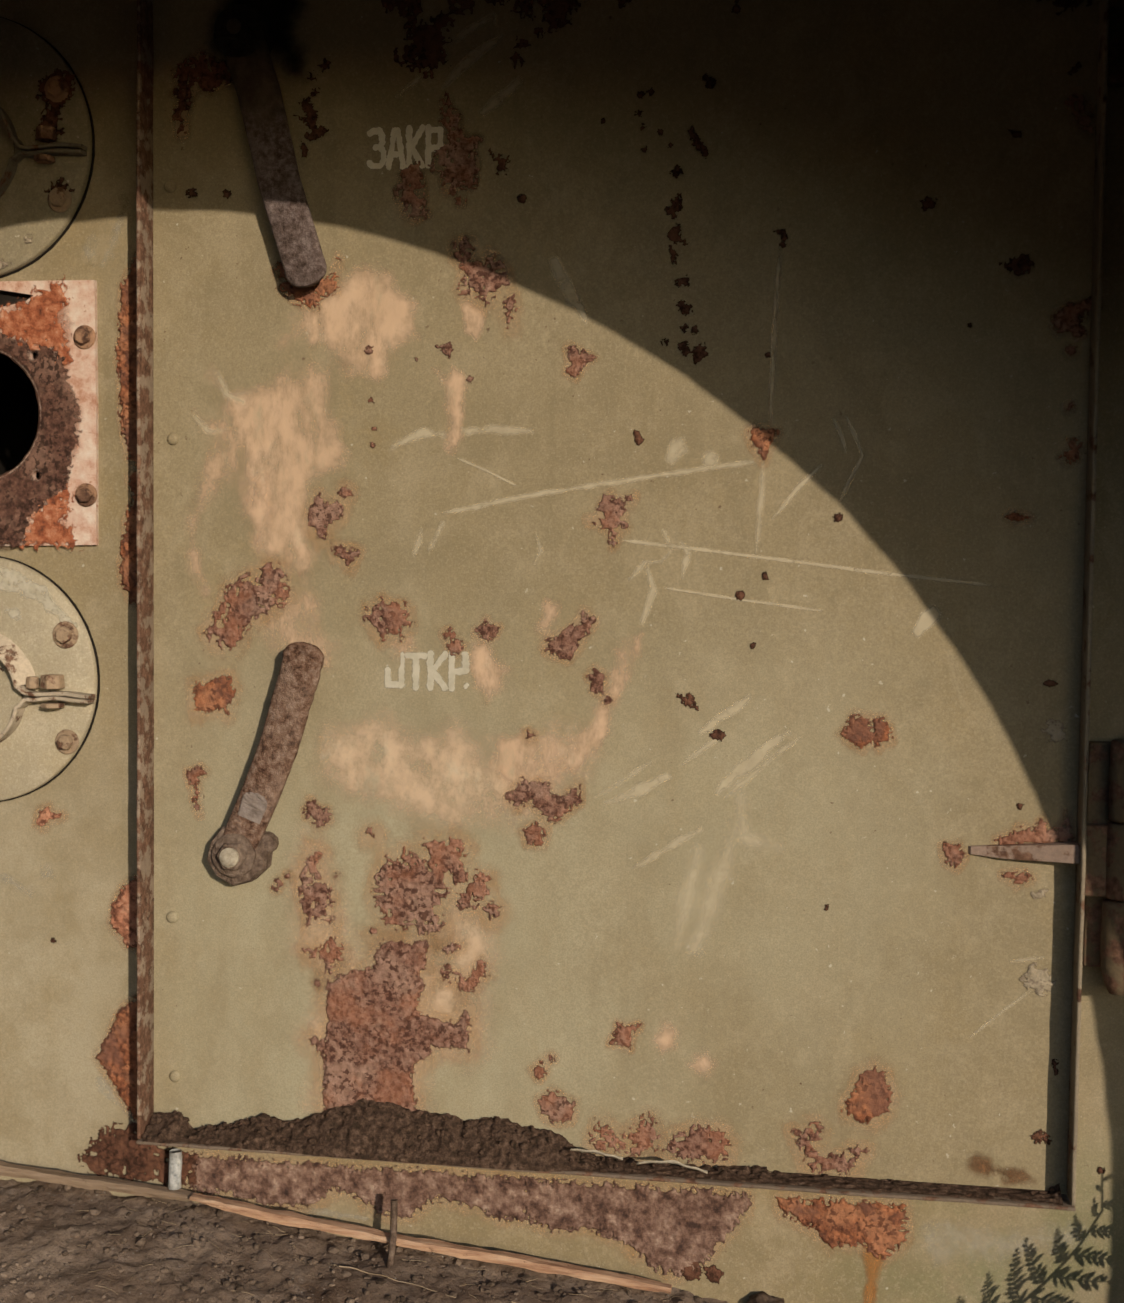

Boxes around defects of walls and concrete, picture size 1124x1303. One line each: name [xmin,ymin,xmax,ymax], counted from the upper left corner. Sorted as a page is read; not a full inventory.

rust [393,91,511,221]
rust [450,236,518,329]
rust [660,164,708,364]
rust [0,275,82,551]
rust [114,257,137,605]
rust [203,562,293,651]
rust [503,776,583,846]
rust [110,876,137,948]
rust [271,836,502,1111]
rust [77,997,752,1284]
rust [841,1066,893,1125]
rust [775,1196,910,1303]